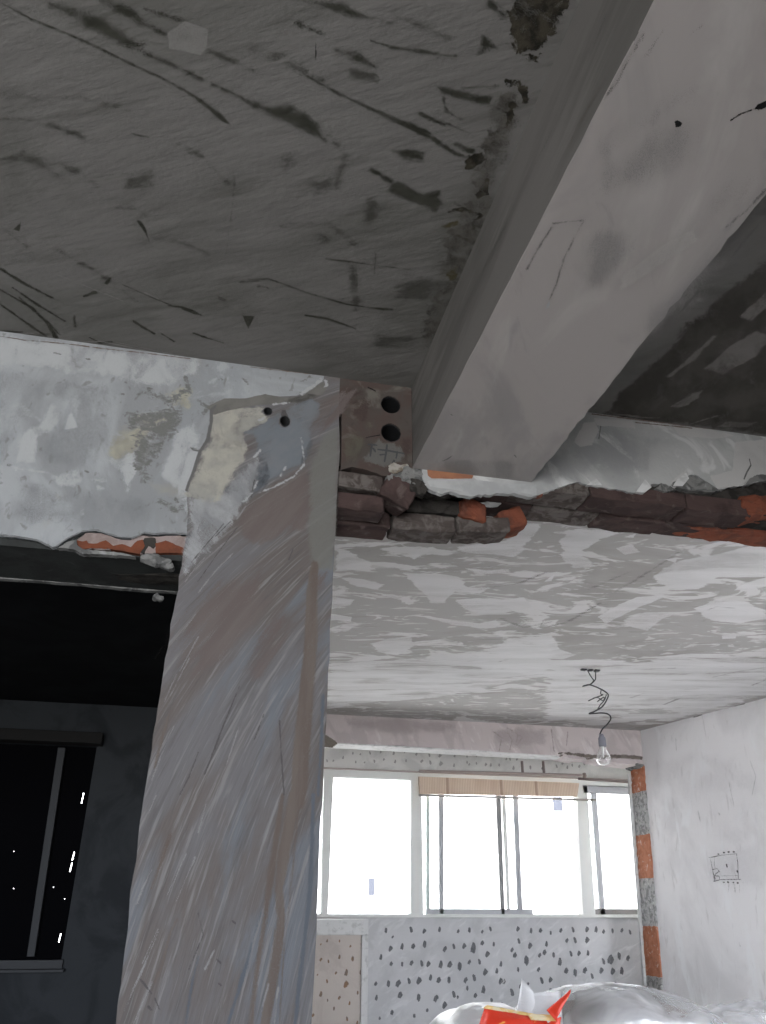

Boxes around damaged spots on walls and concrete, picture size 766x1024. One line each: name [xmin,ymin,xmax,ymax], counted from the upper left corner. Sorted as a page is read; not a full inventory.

flaking render [1,529,188,572]
spalling [335,413,766,555]